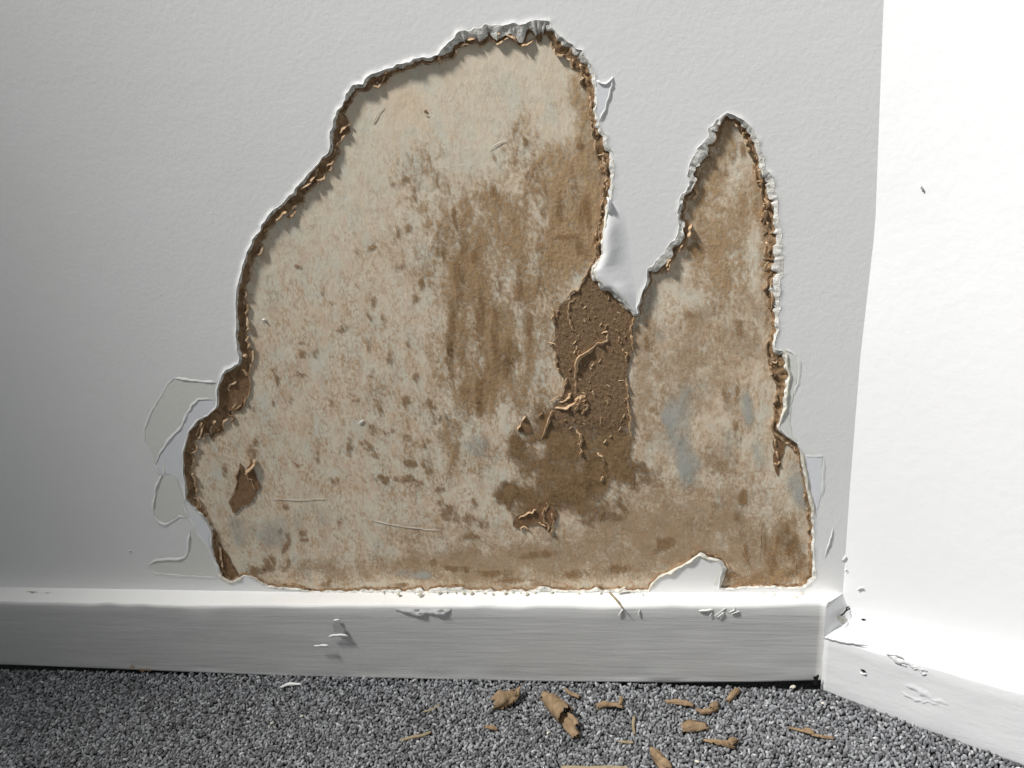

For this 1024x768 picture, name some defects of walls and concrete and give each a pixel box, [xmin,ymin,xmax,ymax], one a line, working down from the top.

spalling [143,20,826,593]
damp [297,65,810,587]
peeling [328,619,348,637]